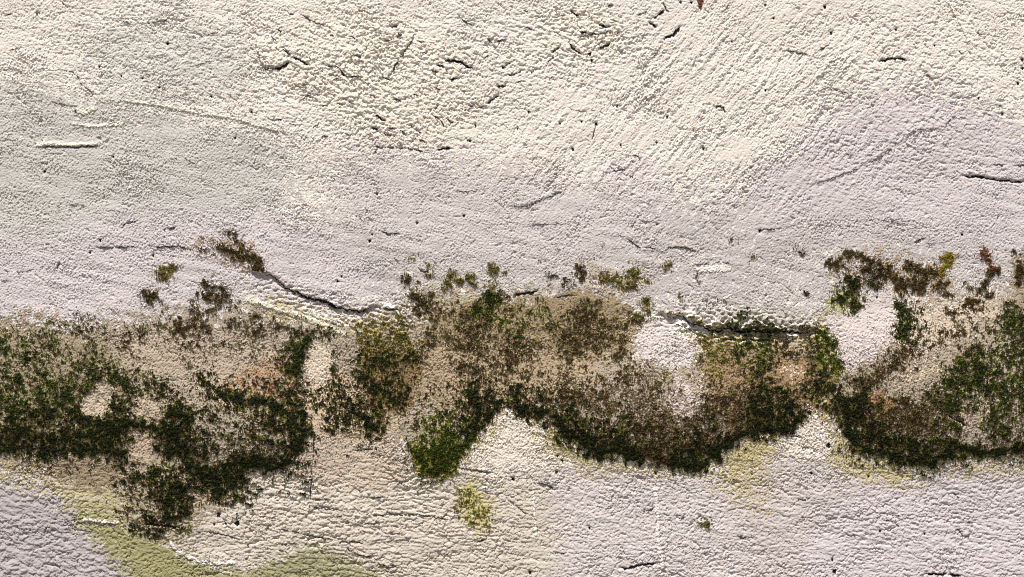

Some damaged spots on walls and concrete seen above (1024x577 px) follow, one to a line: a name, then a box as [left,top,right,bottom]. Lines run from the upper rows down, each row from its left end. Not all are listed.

crack [256,272,423,332]
crack [663,300,810,341]
water stain [0,432,1024,577]